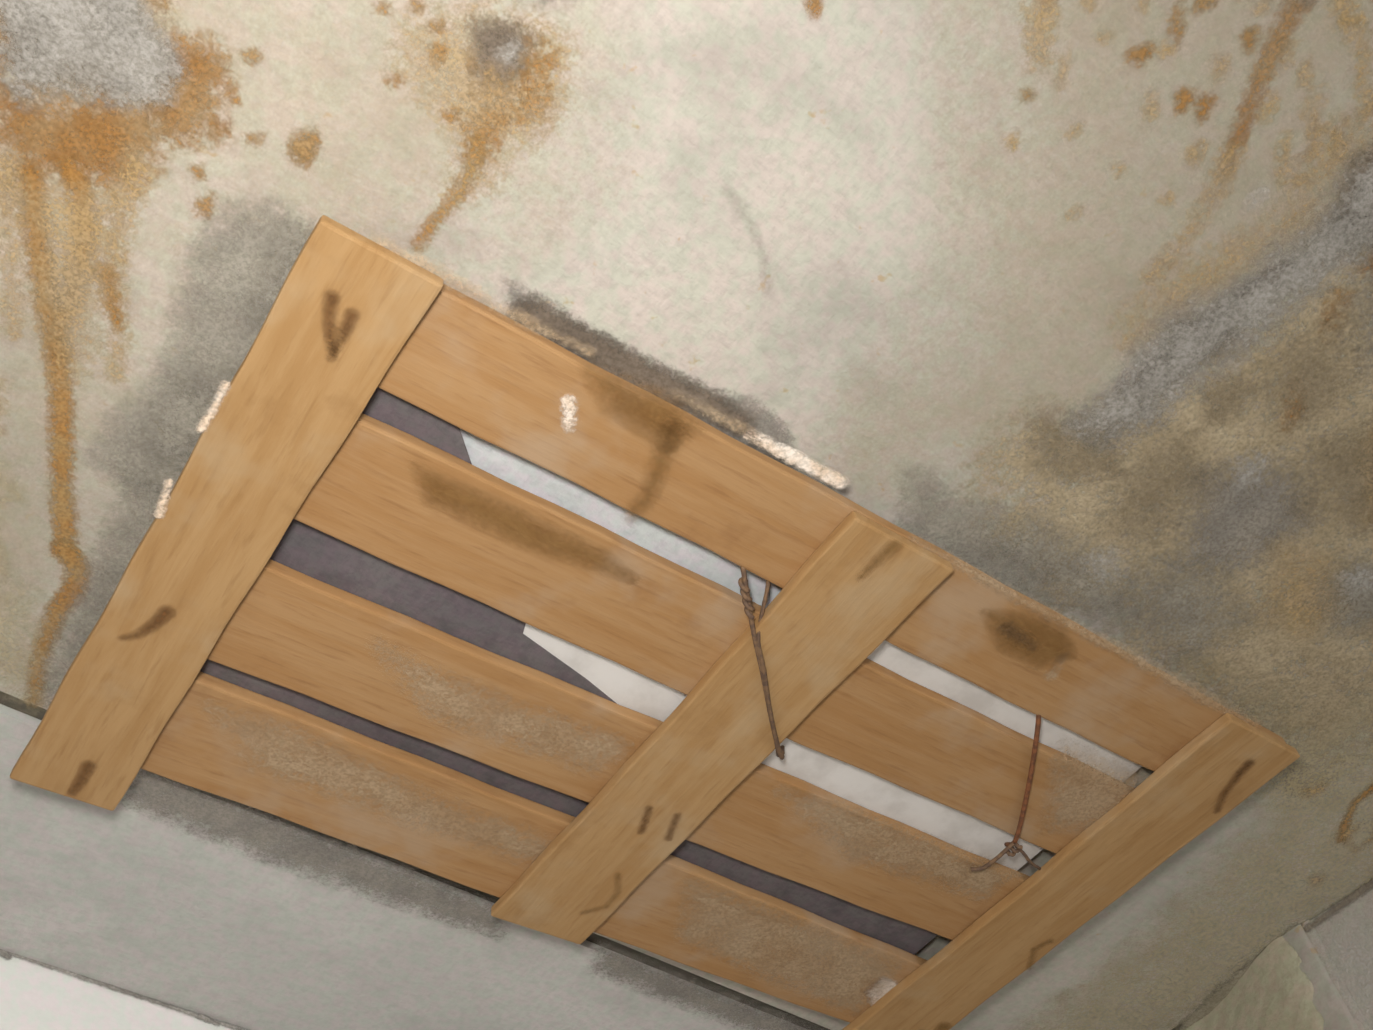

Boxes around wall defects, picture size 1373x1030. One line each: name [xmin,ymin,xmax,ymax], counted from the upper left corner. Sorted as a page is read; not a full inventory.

corrosion [387,5,570,250]
corrosion [807,0,822,15]
corrosion [1175,88,1215,117]
corrosion [0,0,260,705]
leakage [909,251,1373,795]